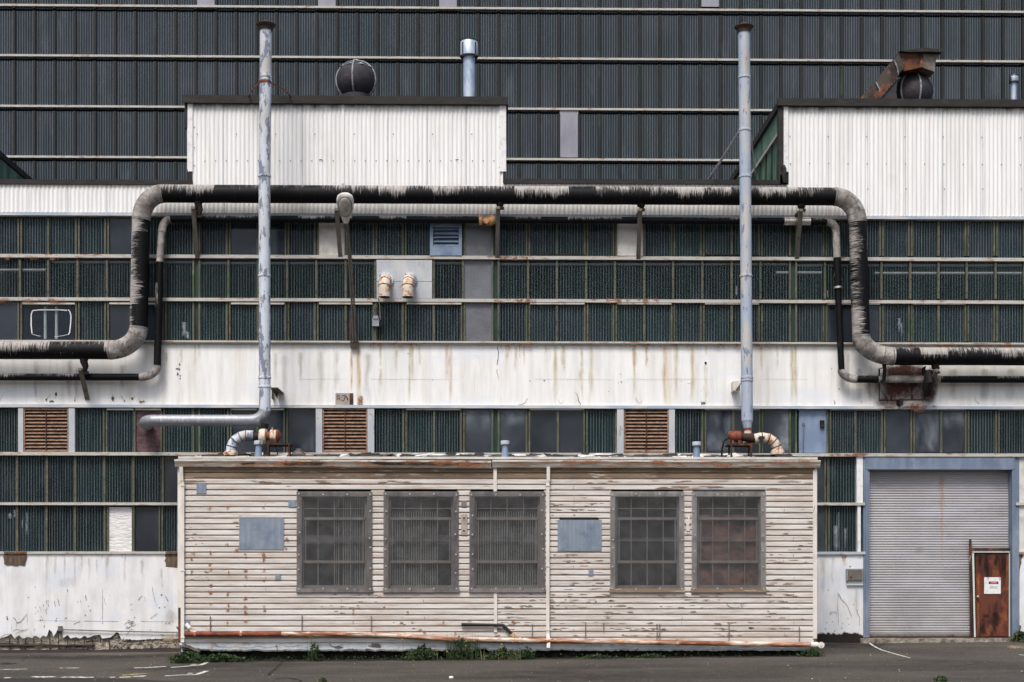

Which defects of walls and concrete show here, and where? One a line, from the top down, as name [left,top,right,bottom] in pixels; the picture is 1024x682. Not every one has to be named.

corrosion [878,365,937,411]
peeling [493,554,666,636]
corrosion [977,555,1008,591]
spalling [0,609,200,652]